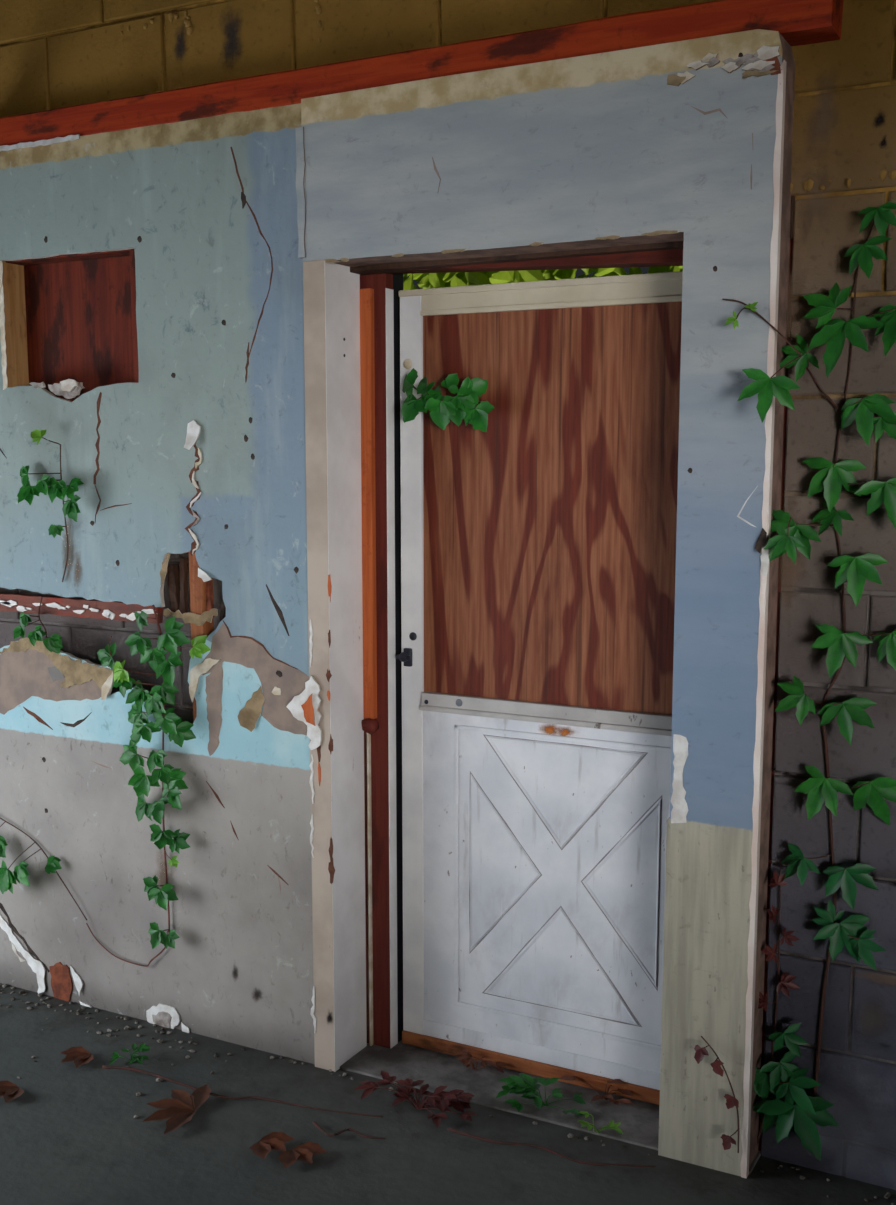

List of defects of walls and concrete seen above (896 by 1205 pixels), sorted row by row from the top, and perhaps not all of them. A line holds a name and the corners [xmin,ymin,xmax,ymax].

water stain [224,19,240,60]
spalling [667,45,783,86]
crack [230,147,273,382]
spalling [0,261,8,390]
spalling [29,379,84,399]
crack [93,392,132,522]
spalling [266,584,289,636]
peeling [286,619,333,858]
peeling [671,734,688,823]
crack [0,903,50,994]
spalling [146,1003,190,1033]